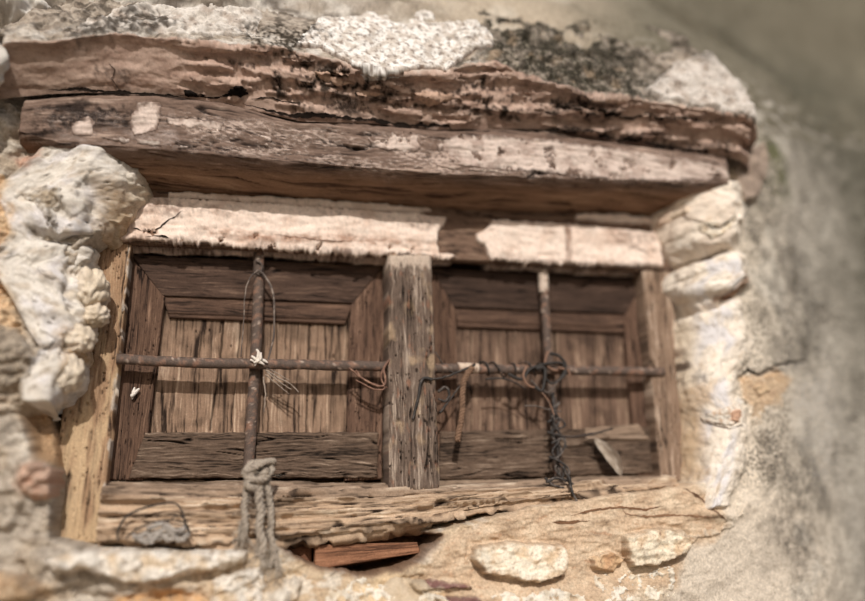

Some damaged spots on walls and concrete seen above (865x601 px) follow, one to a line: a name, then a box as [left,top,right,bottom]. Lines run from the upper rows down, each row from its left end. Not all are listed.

crack [45,63,178,97]
spalling [0,205,8,244]
spalling [24,185,64,229]
spalling [0,283,62,419]
crack [739,360,804,378]
spalling [700,372,797,426]